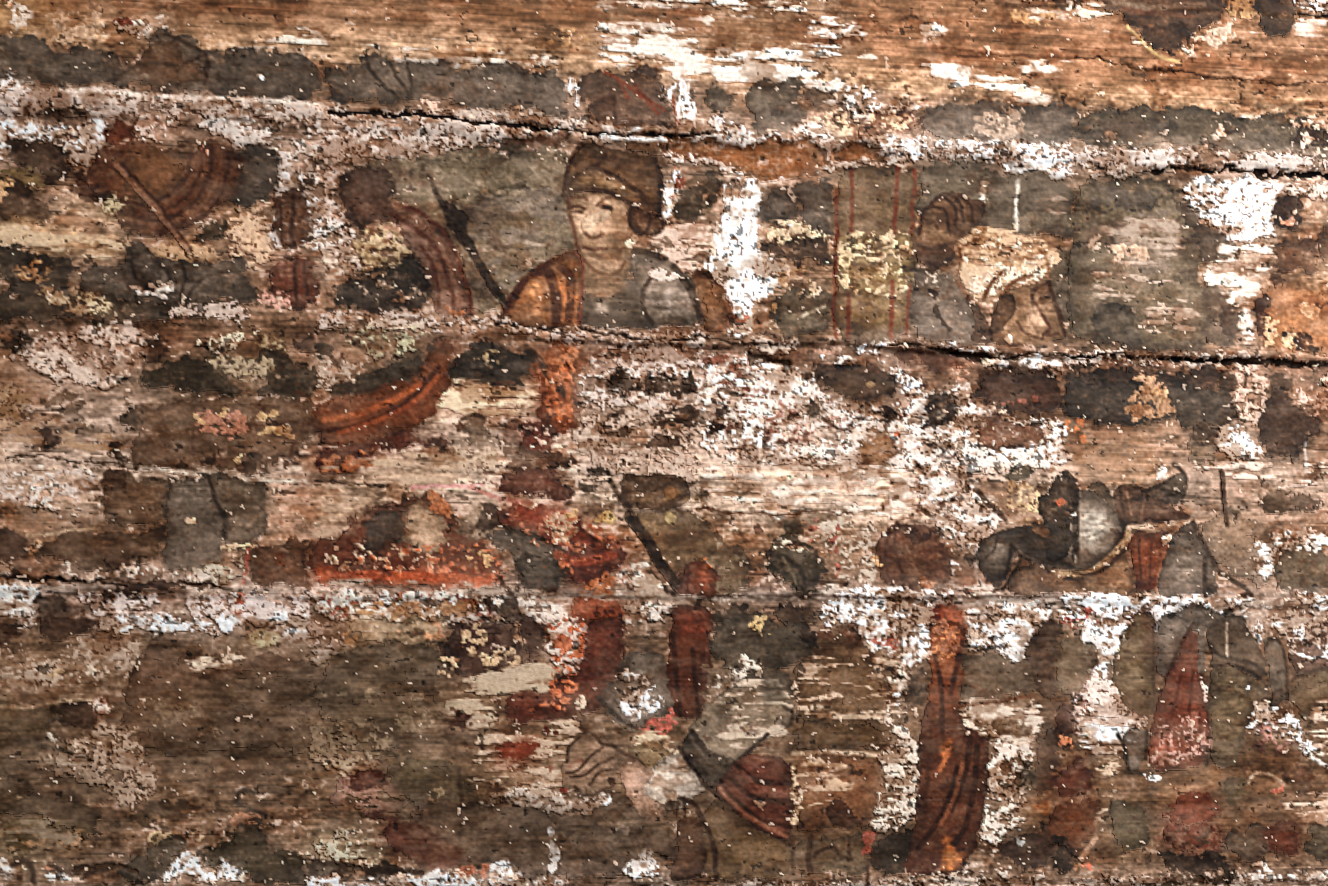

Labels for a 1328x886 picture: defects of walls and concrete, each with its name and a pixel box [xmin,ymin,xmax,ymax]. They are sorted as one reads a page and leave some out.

peeling [1098,0,1297,57]
crack [328,111,712,140]
peeling [0,16,1328,419]
peeling [121,162,538,476]
crack [579,327,721,342]
crack [889,342,1328,370]
peeling [38,614,99,641]
peeling [0,527,187,598]
peeling [241,538,314,591]
peeling [486,462,830,769]
peeling [923,364,1328,798]
peeling [308,615,547,806]